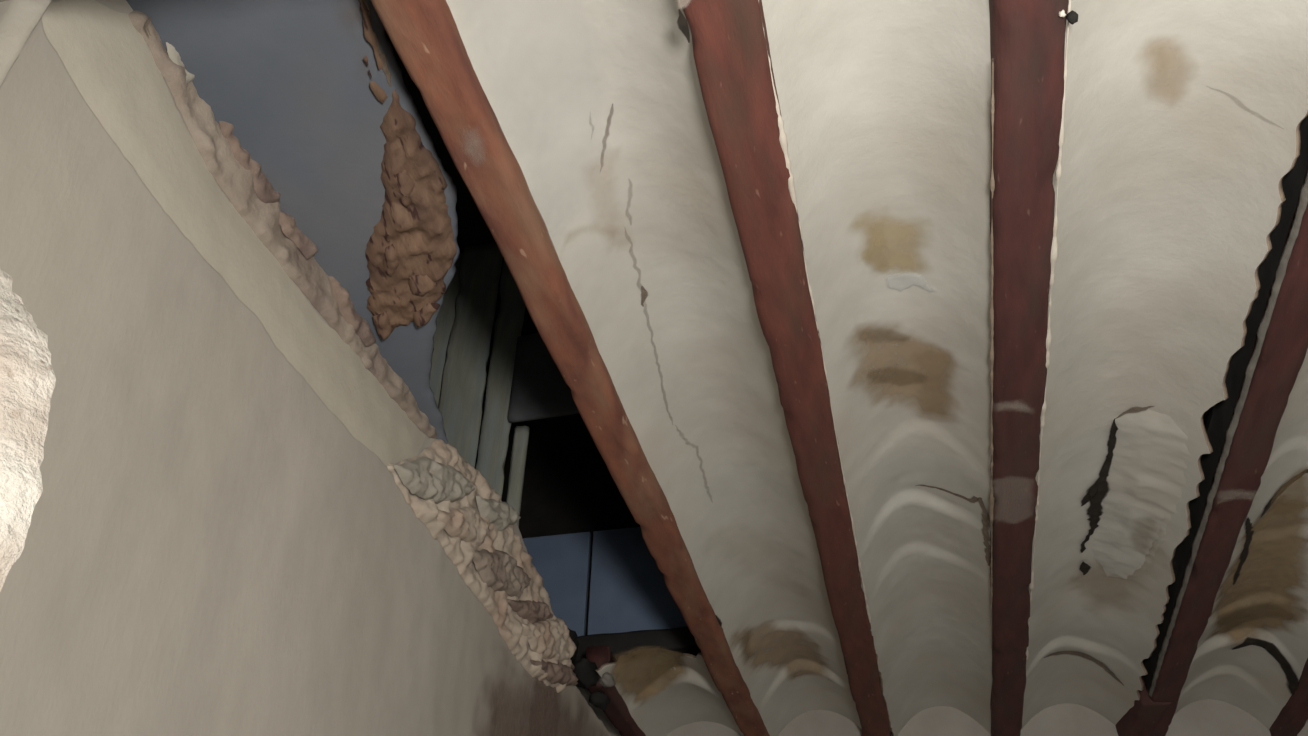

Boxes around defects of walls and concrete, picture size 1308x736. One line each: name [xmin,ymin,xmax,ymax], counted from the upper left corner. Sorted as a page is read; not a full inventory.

crack [640,286,648,307]
spalling [128,0,578,693]
damp [857,331,950,415]
crack [1044,116,1308,696]
crack [916,485,990,566]
damp [612,647,684,701]
damp [736,625,823,677]